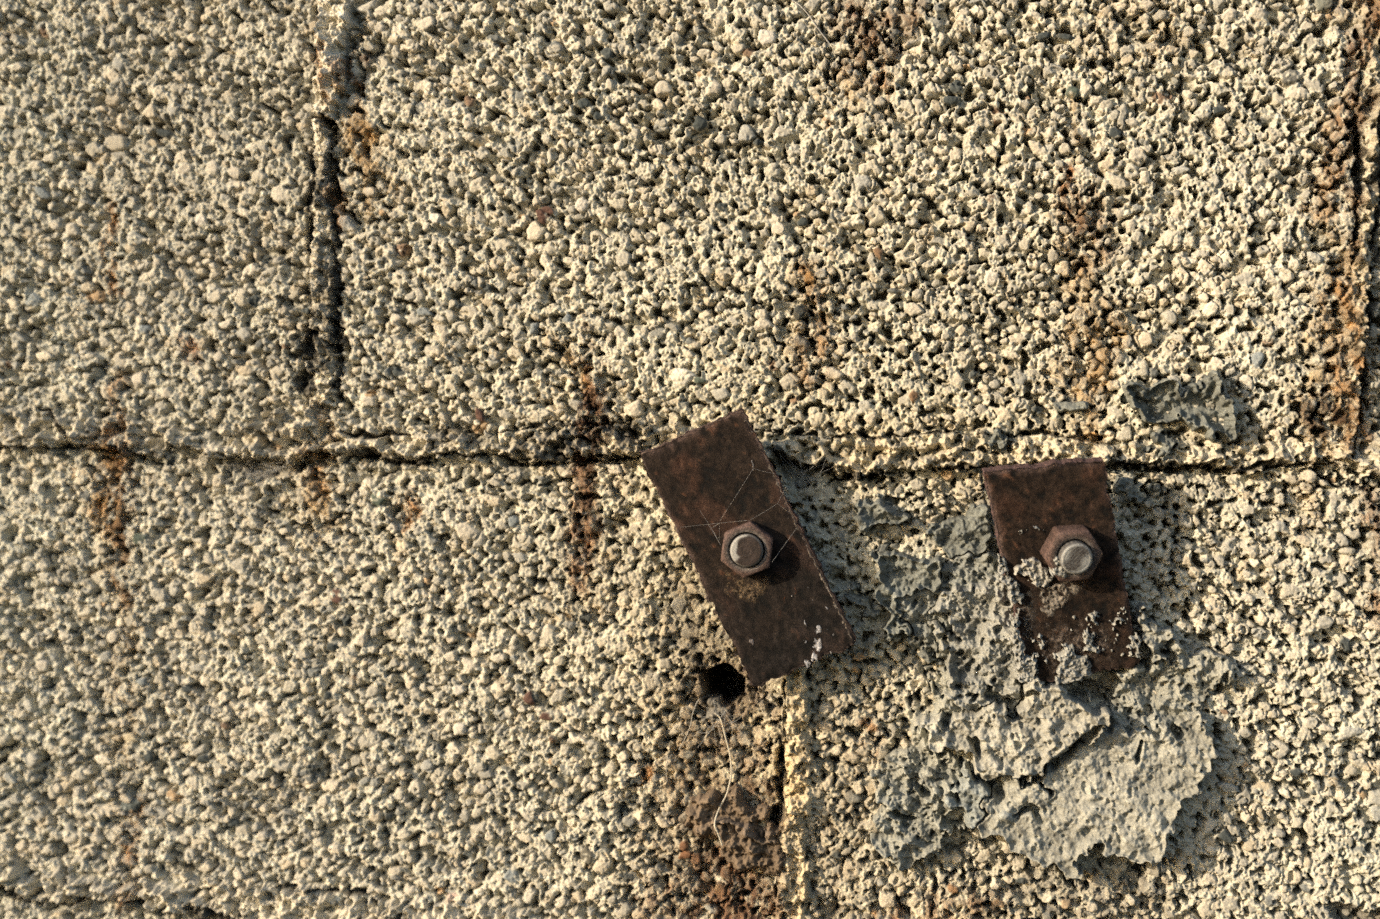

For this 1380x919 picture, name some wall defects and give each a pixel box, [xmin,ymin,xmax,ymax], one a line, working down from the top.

crack [288,17,645,468]
rust [1304,288,1359,434]
rust [569,362,602,590]
spalling [1067,679,1103,695]
rust [715,863,756,919]